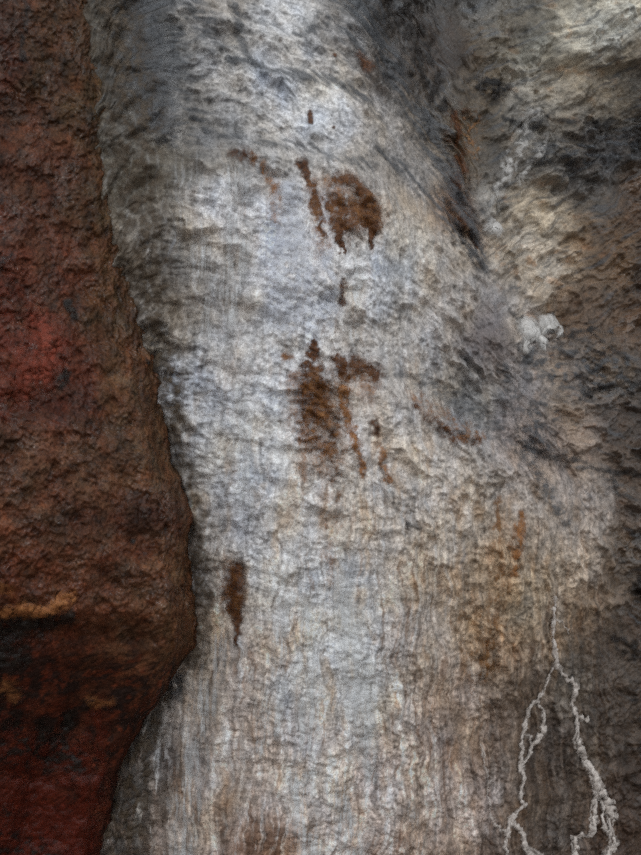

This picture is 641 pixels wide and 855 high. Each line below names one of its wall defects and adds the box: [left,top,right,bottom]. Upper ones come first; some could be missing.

rust [295,158,383,254]
rust [339,279,348,306]
rust [288,339,383,478]
rust [370,420,393,483]
rust [224,561,245,645]